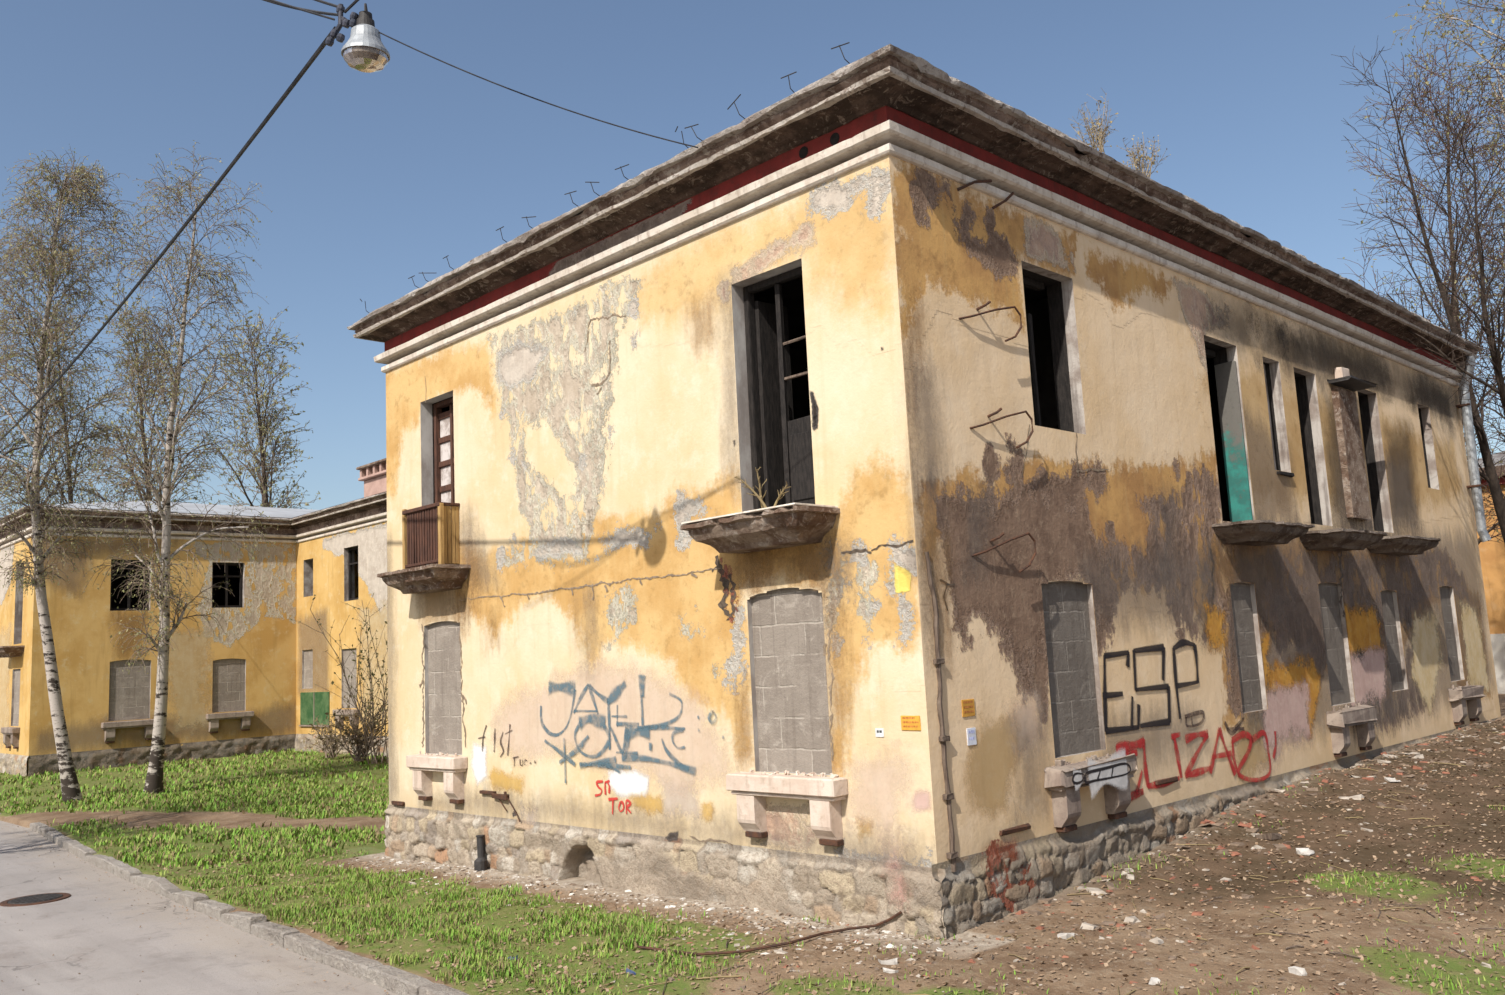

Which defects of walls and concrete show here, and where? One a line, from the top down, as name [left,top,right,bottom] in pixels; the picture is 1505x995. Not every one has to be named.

spalling [354,54,1477,355]
crack [419,555,736,747]
peeling [0,155,1496,797]
crack [841,540,913,554]
damp [934,432,1469,733]
flaking render [980,839,1041,912]